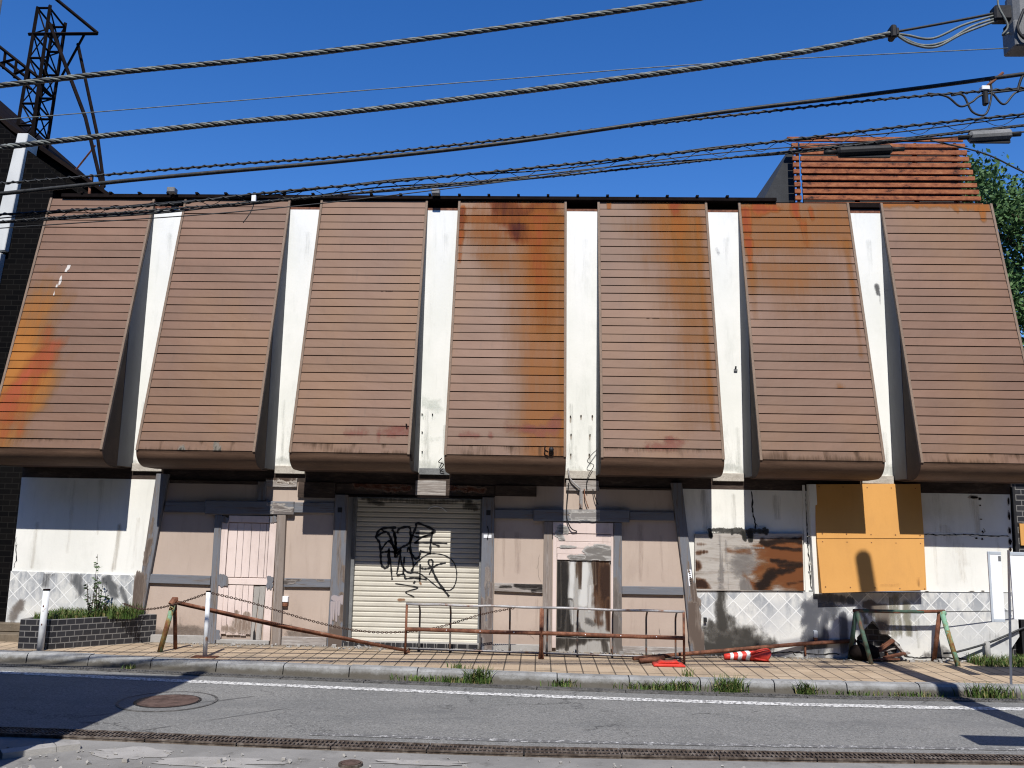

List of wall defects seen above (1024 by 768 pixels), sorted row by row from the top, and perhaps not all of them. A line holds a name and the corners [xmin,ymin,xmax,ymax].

rust [0,291,62,447]
rust [459,201,593,459]
rust [649,202,708,343]
rust [741,203,852,271]